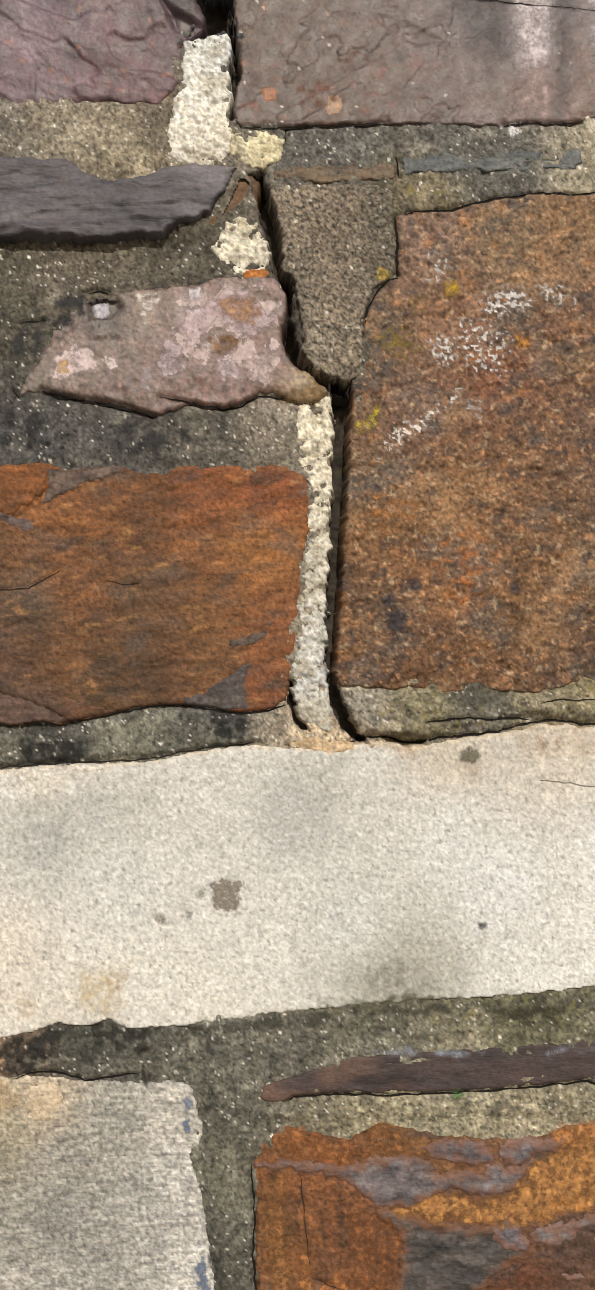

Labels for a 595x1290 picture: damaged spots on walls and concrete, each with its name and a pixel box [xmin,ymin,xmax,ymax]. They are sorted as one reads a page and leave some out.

crack [481,0,595,11]
damp [513,0,551,118]
crack [196,0,386,141]
crack [503,120,579,128]
crack [0,175,595,768]
crack [15,1070,141,1081]
crack [288,1080,595,1101]